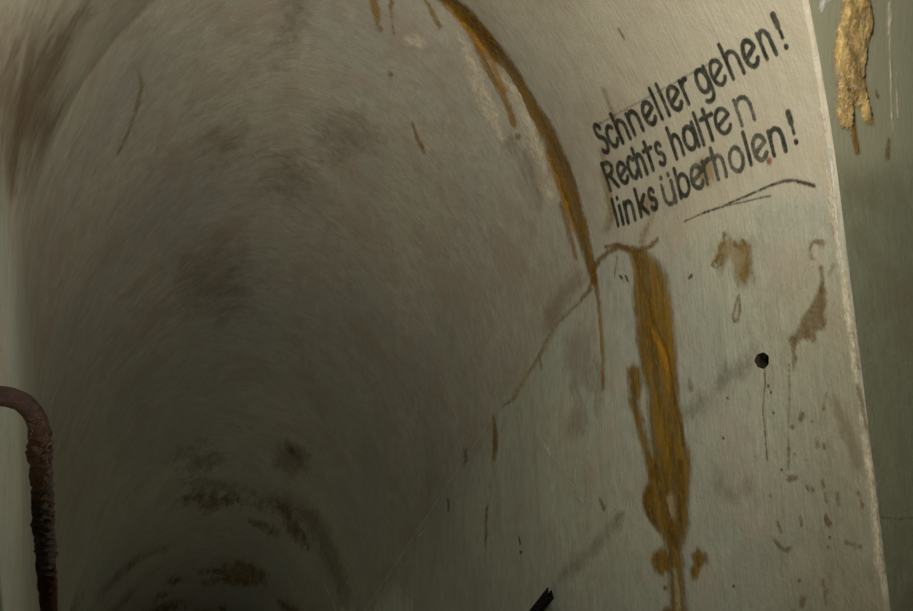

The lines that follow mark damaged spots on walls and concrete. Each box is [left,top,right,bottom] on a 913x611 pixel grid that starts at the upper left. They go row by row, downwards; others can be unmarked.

corrosion [441,0,706,611]
leakage [790,266,832,362]